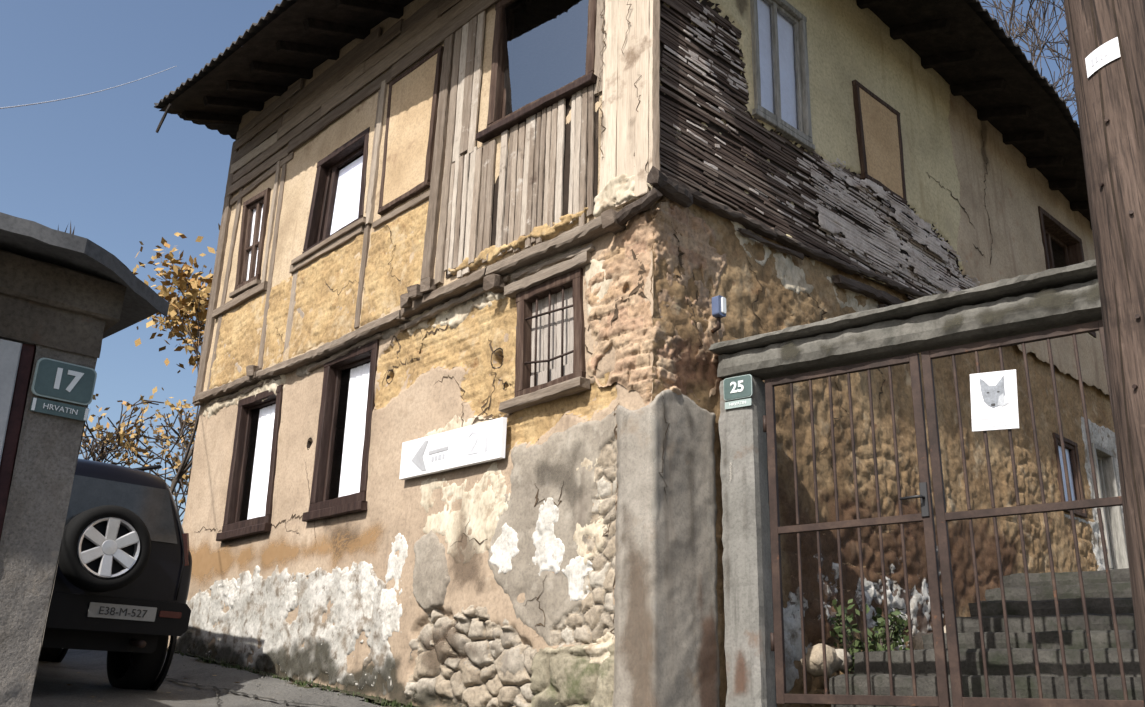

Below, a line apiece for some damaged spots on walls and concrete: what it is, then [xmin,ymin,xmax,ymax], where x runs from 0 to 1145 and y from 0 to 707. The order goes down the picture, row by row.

spalling [203,0,980,454]
crack [927,130,993,263]
crack [381,313,469,388]
crack [438,339,513,425]
peeling [174,533,537,707]
peeling [488,473,519,574]
flaking render [529,436,618,665]
damp [624,555,656,707]